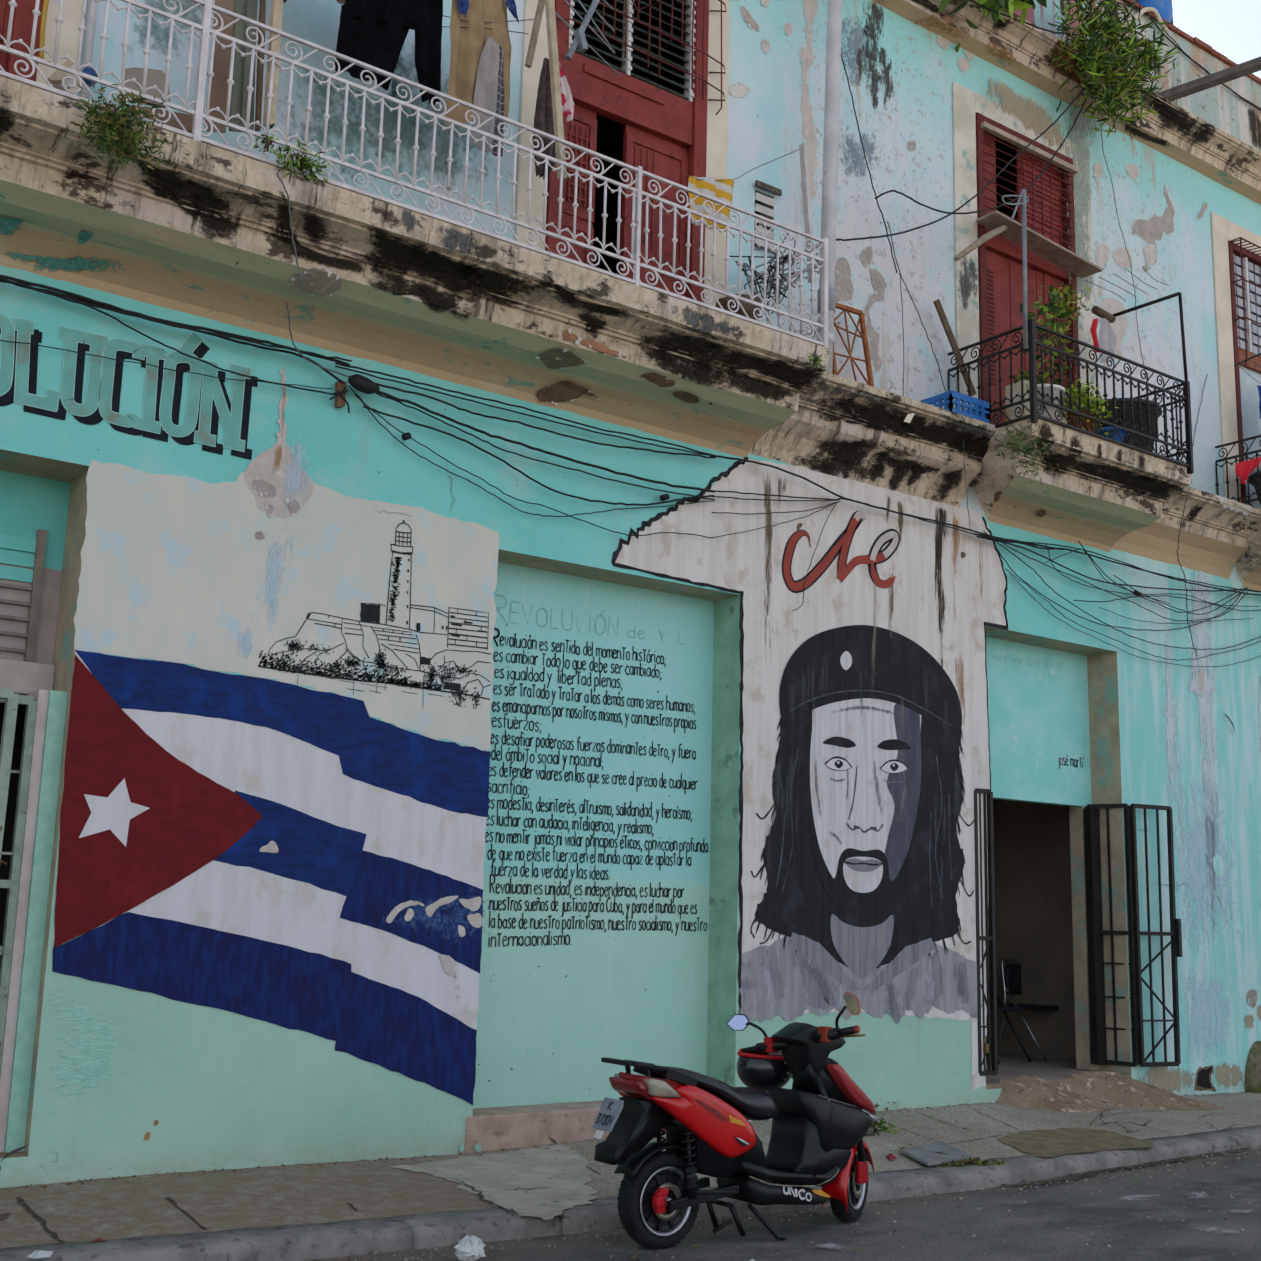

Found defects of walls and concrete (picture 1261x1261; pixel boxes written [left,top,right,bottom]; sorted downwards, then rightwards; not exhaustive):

water stain [841,3,895,112]
water stain [1124,89,1215,146]
water stain [133,158,240,239]
water stain [275,192,635,338]
peeling [835,245,888,377]
peeling [1096,295,1129,364]
peeling [1095,180,1177,277]
peeling [244,364,314,540]
water stain [638,305,995,667]
water stain [1036,423,1203,521]
peeling [386,895,483,937]
spalling [439,954,460,998]